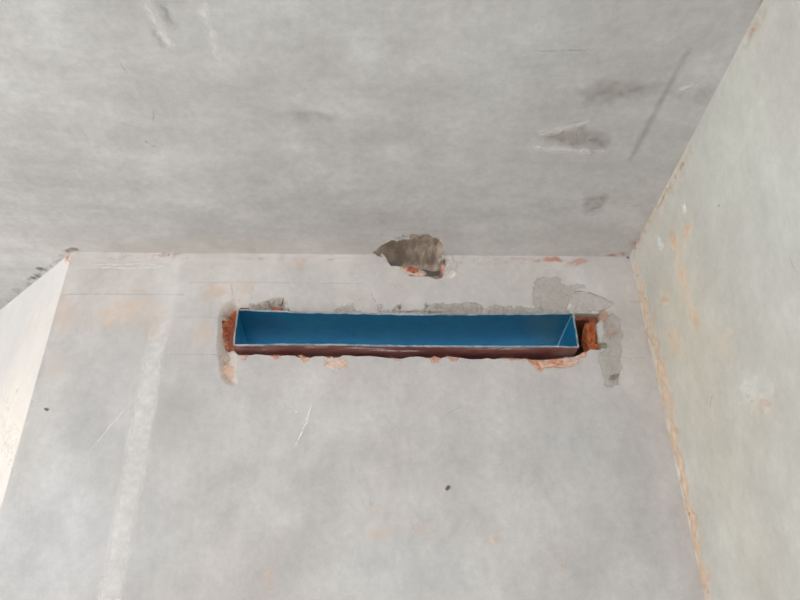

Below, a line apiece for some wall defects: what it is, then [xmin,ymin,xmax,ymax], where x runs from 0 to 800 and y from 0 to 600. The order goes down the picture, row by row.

spalling [529,313,601,371]